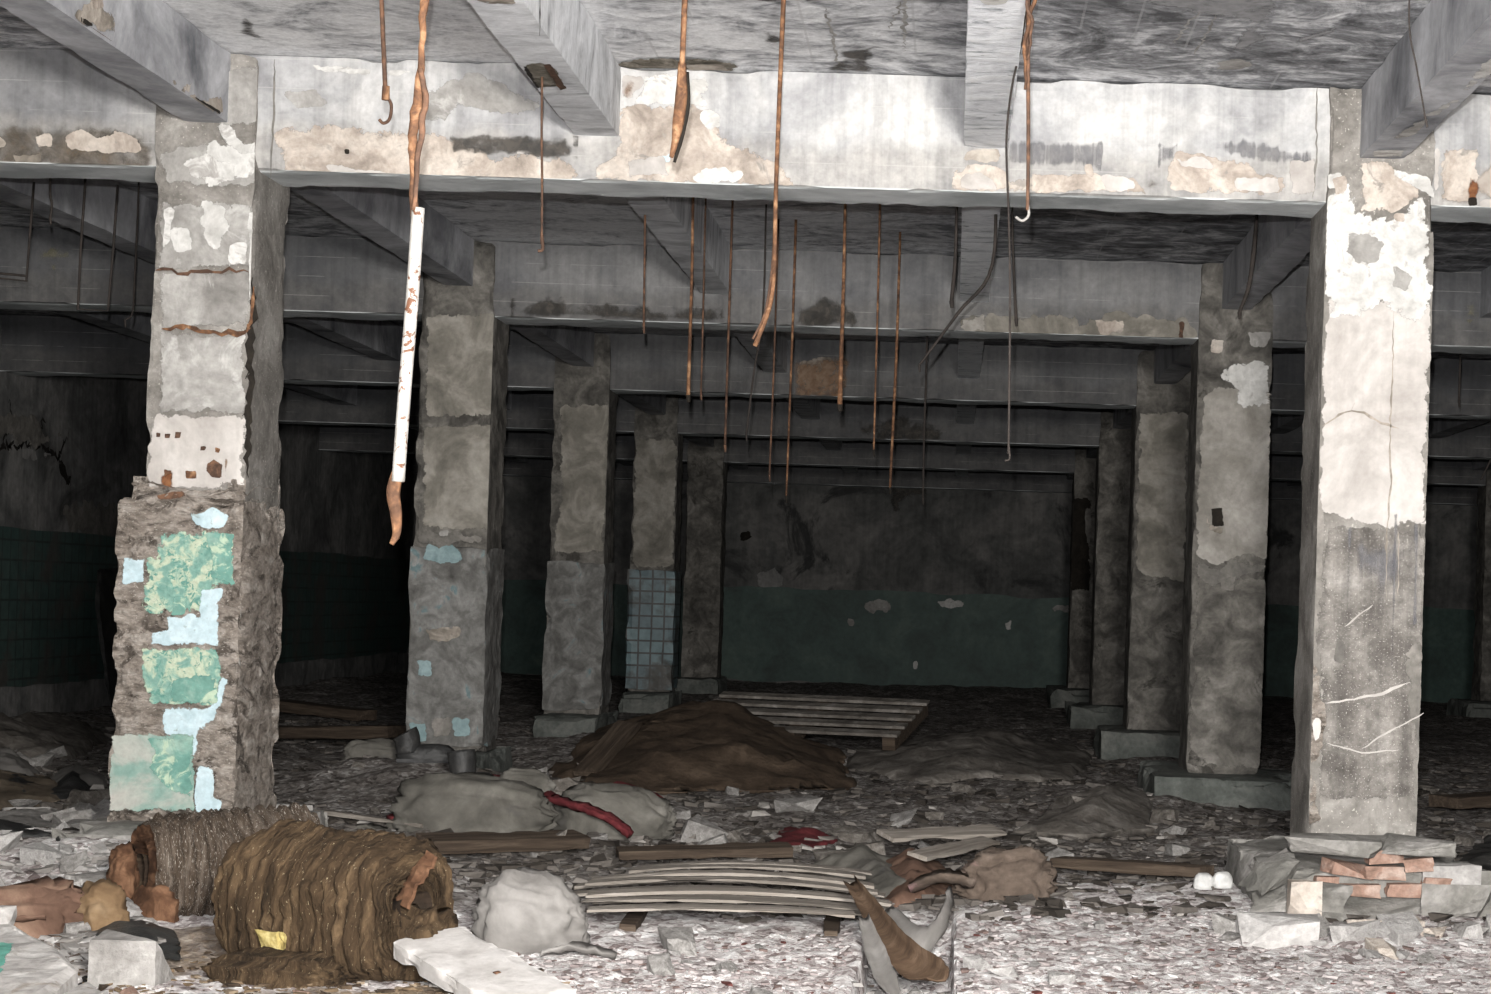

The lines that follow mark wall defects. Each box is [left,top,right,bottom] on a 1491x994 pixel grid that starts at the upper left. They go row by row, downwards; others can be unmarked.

peeling [163,66,258,297]
peeling [274,58,793,186]
peeling [1167,59,1491,321]
rust [796,357,848,396]
spalling [0,412,118,537]
rust [386,472,402,545]
peeling [109,487,246,812]
crack [1328,682,1423,754]